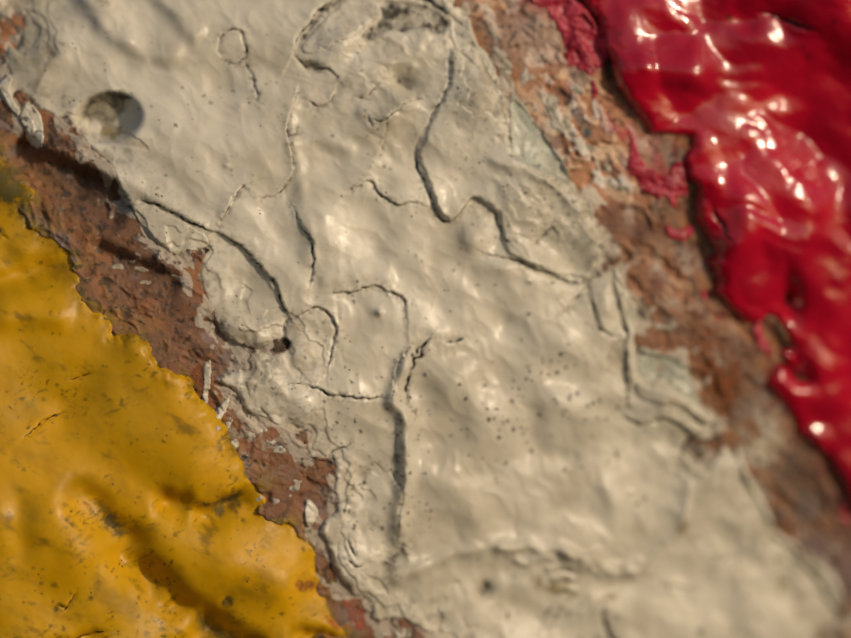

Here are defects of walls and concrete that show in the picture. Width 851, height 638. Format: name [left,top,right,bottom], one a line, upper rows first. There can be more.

crack [219,29,258,96]
peeling [294,0,532,87]
peeling [0,73,44,149]
crack [286,58,339,164]
peeling [132,203,210,255]
crack [142,200,289,331]
crack [355,72,709,441]
peeling [202,360,212,403]
spalling [272,337,290,352]
crack [292,338,463,399]
peeling [589,269,714,440]
crack [304,438,351,476]